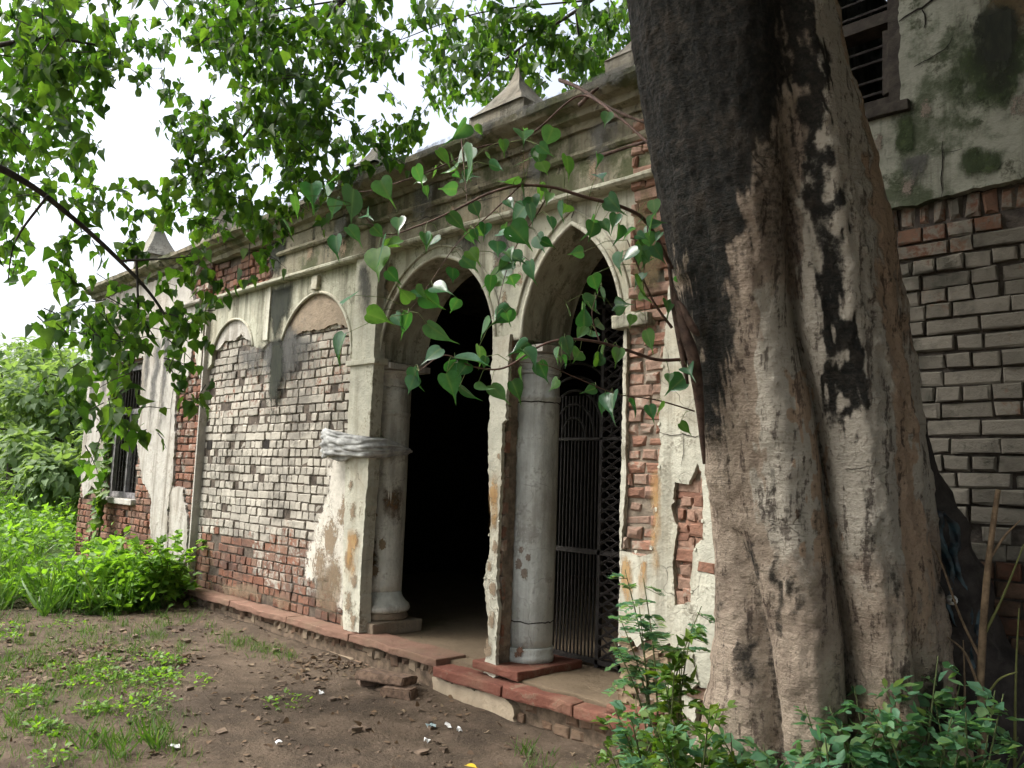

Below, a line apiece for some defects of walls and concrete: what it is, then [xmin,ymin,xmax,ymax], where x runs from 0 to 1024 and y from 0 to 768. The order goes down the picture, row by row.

water stain [949,0,1024,111]
peeling [312,481,359,630]
spalling [671,480,704,604]